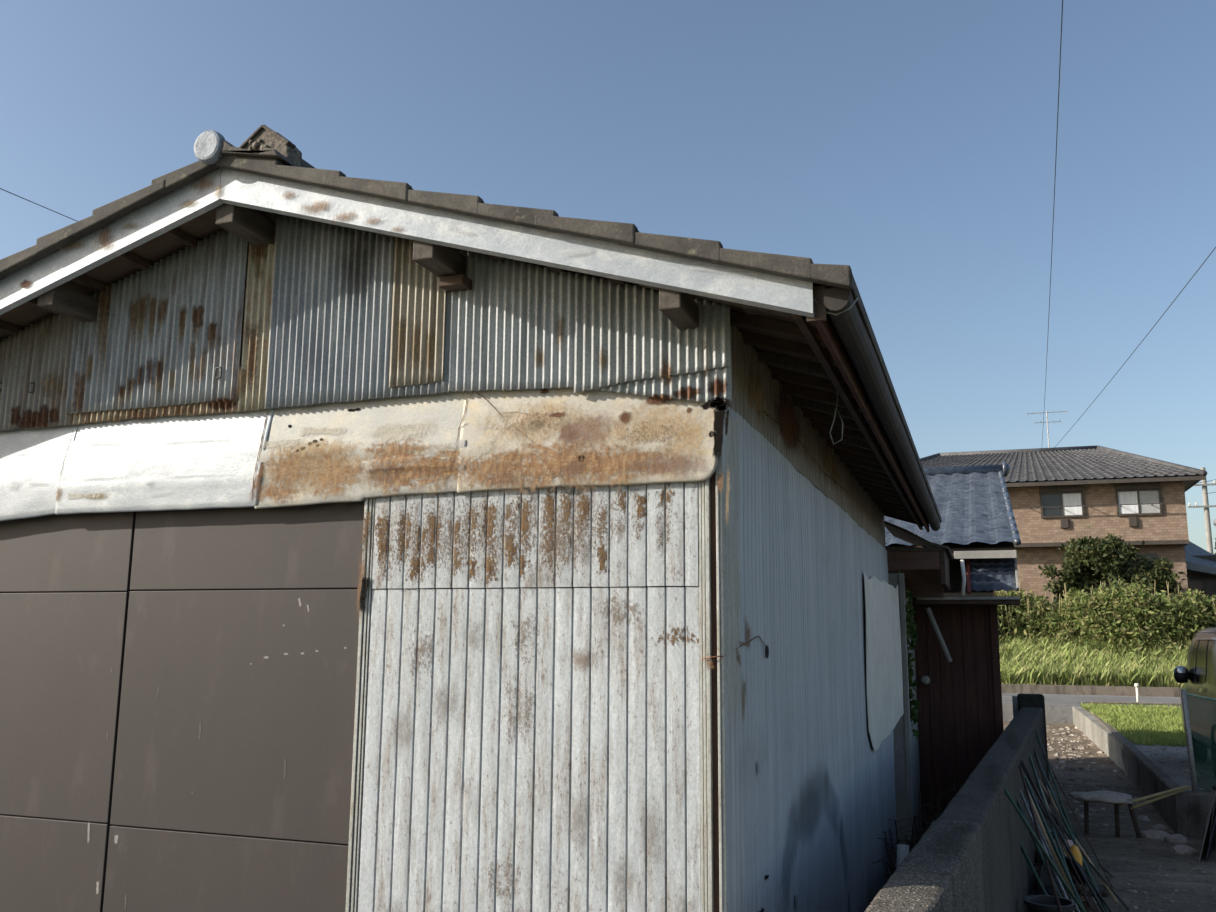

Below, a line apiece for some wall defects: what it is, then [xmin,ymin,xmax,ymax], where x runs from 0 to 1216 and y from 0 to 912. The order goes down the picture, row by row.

corrosion [108,297,216,421]
corrosion [398,324,435,364]
corrosion [646,351,727,413]
corrosion [11,405,59,429]
corrosion [254,412,697,611]